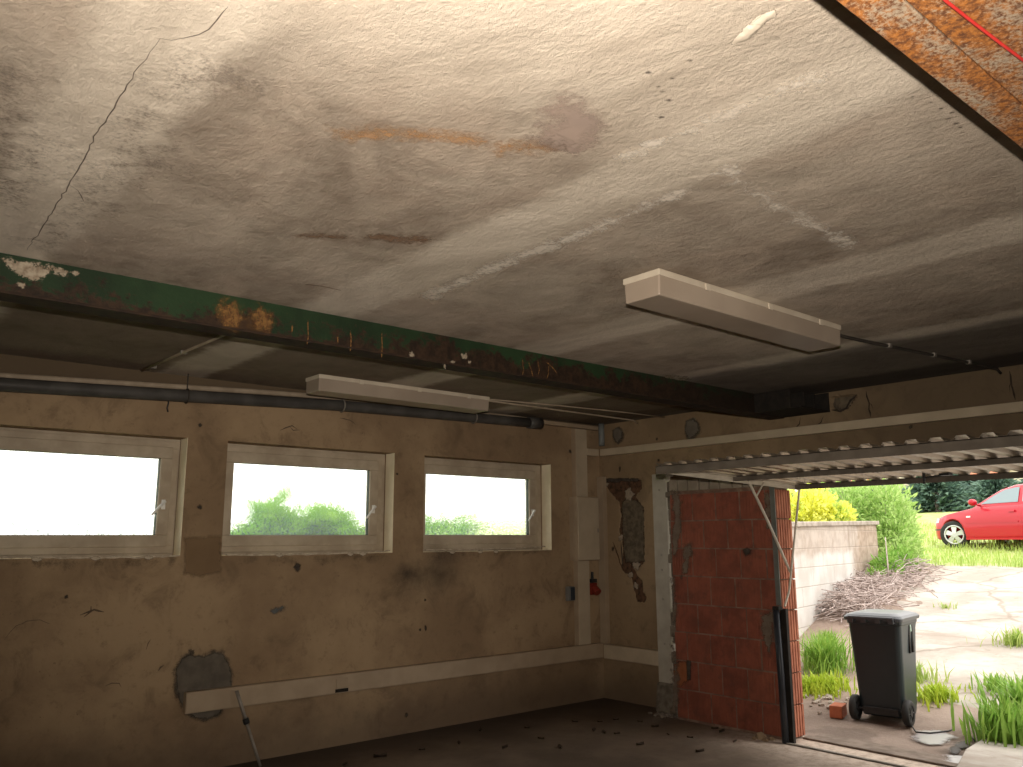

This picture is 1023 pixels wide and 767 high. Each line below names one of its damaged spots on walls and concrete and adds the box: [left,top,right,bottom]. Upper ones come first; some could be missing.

crack [27,7,228,249]
corrosion [368,233,428,244]
peeling [2,258,80,289]
corrosion [216,299,273,333]
spalling [606,467,647,603]